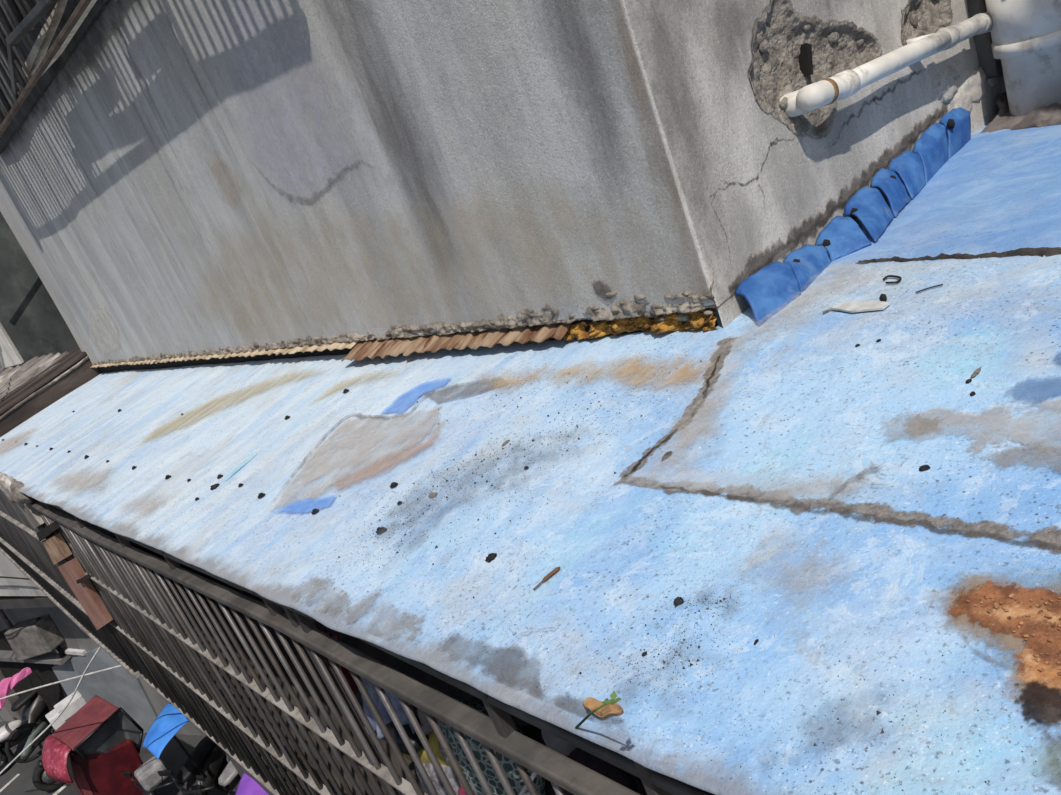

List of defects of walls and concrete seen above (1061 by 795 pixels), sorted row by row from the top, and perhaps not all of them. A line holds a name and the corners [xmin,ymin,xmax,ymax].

spalling [748,0,882,140]
crack [828,71,918,147]
spalling [901,0,953,46]
crack [710,134,786,262]
peeling [274,378,503,513]
leakage [1011,377,1061,401]
rust [946,579,1061,774]